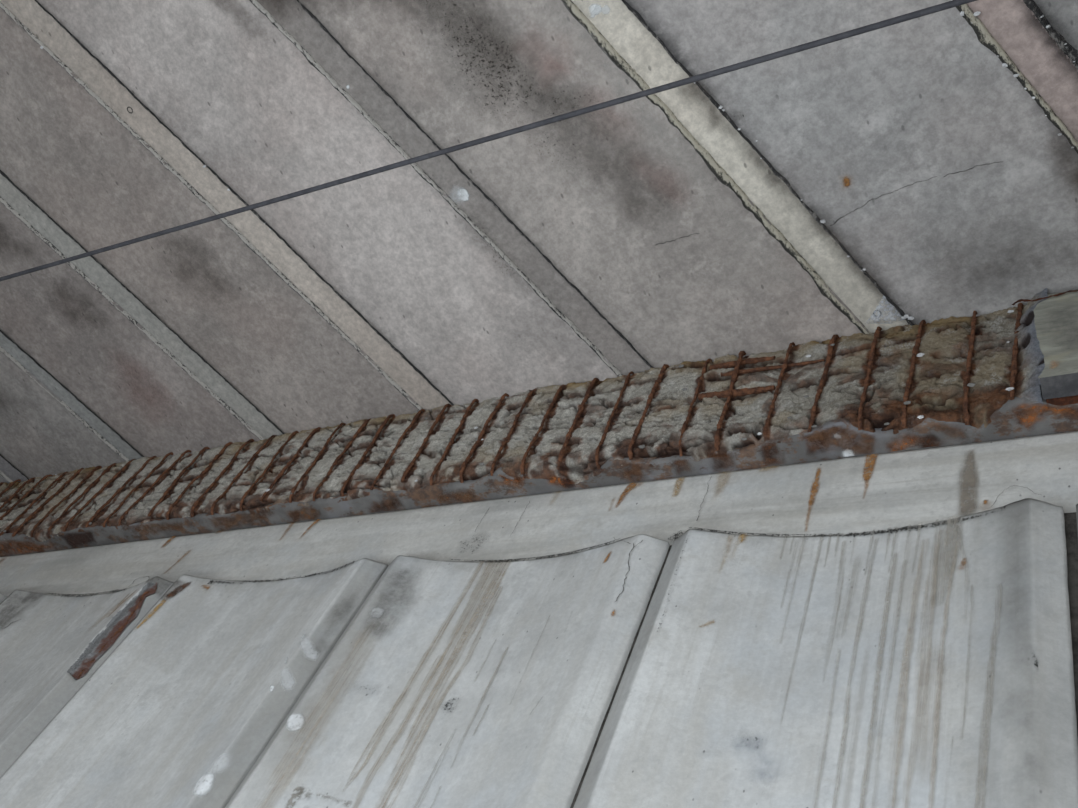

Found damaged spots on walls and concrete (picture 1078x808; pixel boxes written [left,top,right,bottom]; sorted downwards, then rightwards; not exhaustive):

spalling [0,288,1048,542]